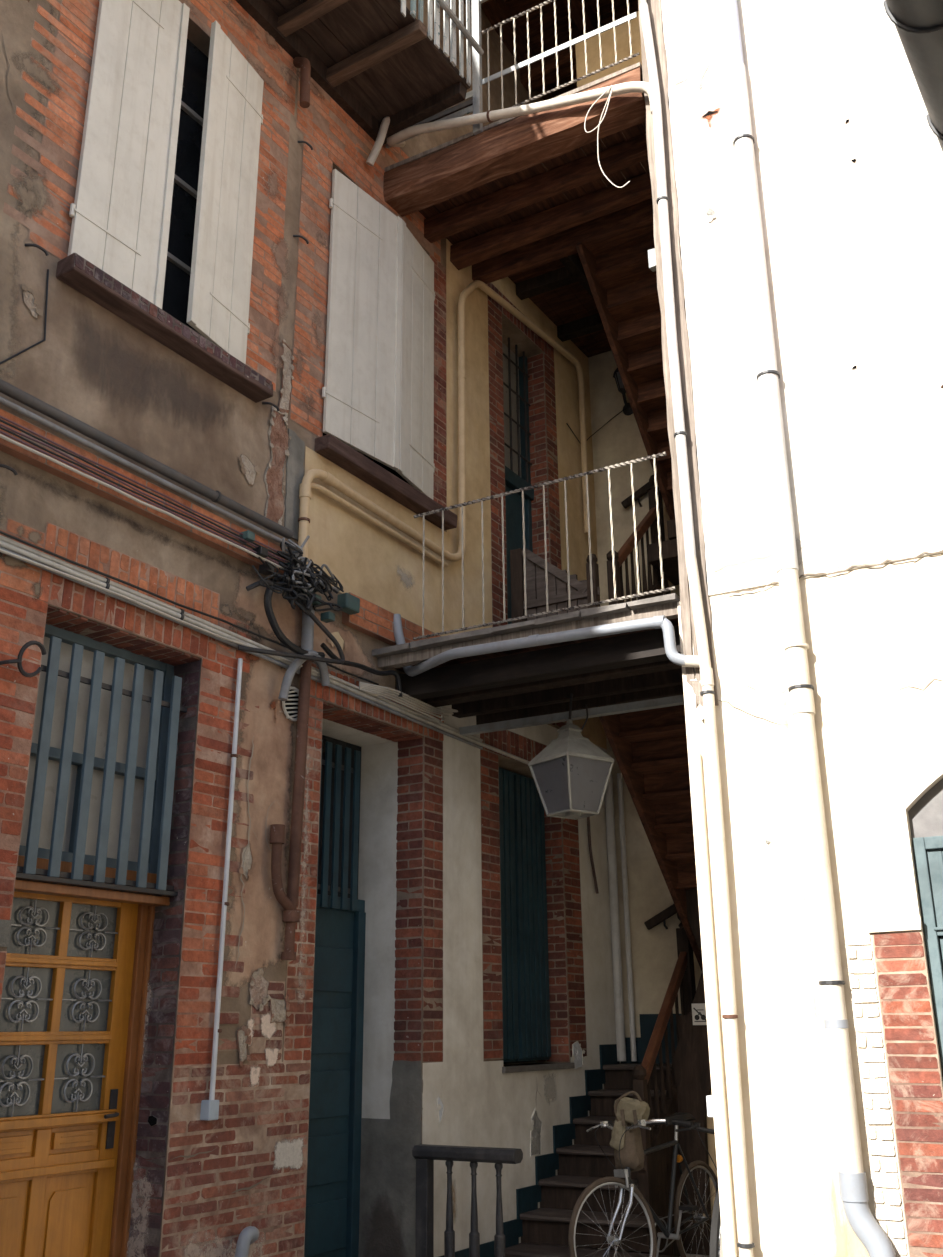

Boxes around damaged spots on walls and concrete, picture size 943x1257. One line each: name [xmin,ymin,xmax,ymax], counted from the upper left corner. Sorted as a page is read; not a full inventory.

rust [701,107,720,127]
flaking render [239,339,294,525]
leakage [796,540,808,564]
crack [708,543,943,604]
flaking render [237,968,290,1086]